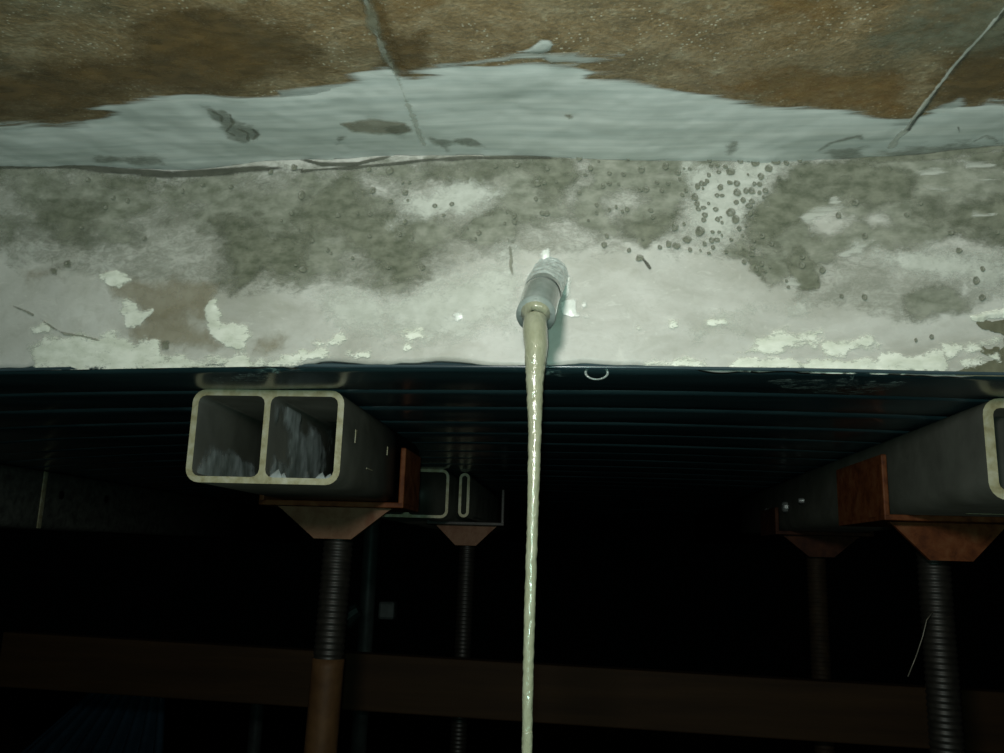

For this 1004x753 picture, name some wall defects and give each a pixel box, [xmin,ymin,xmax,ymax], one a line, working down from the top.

leakage [279,86,342,96]
corrosion [376,34,428,73]
leakage [437,53,600,67]
crack [858,8,1004,163]
leakage [0,155,724,343]
spalling [638,159,802,273]
leakage [725,150,1004,290]
peeling [98,270,154,328]
peeling [204,298,252,354]
peeling [729,334,1004,376]
leakage [903,286,971,321]
spalling [970,266,1004,335]